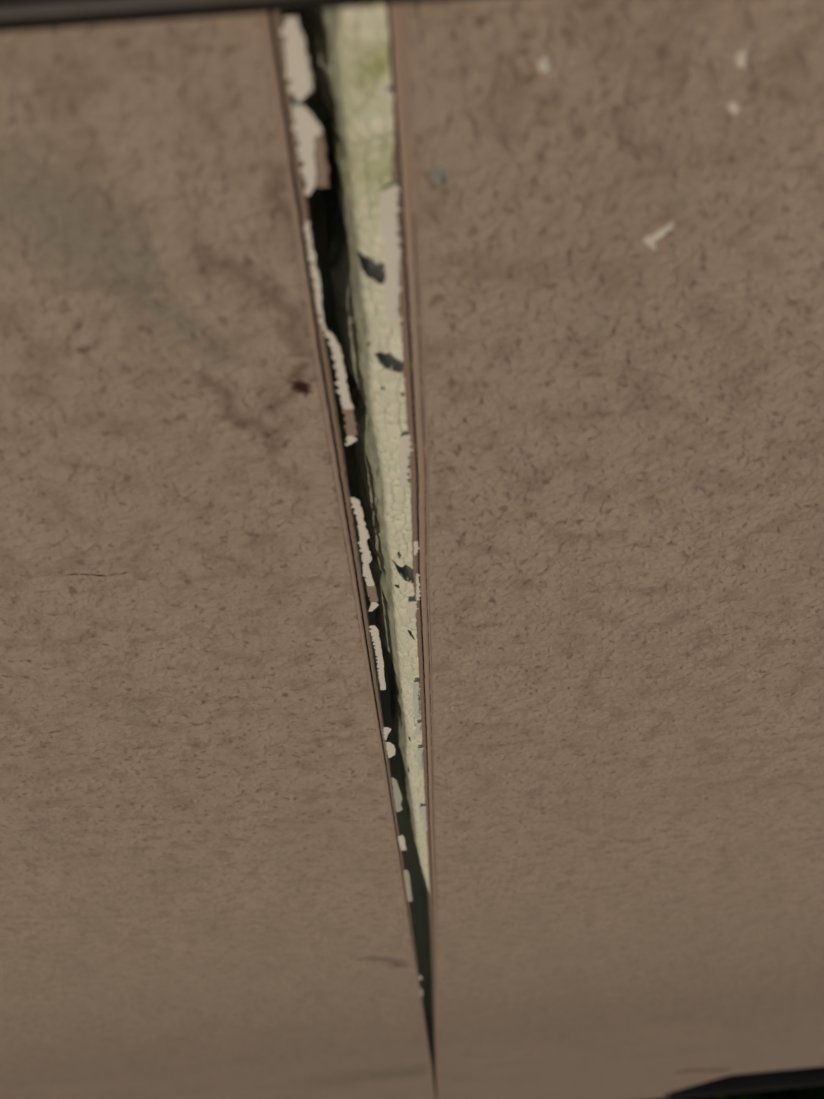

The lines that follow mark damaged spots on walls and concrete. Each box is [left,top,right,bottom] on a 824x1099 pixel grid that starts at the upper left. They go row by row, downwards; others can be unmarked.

peeling [281,16,329,196]
peeling [379,185,403,332]
peeling [303,221,358,446]
peeling [399,435,414,488]
peeling [350,497,379,612]
peeling [407,573,421,617]
peeling [369,625,386,690]
peeling [383,727,396,758]
peeling [413,682,425,771]
peeling [391,777,403,812]
peeling [403,870,412,902]